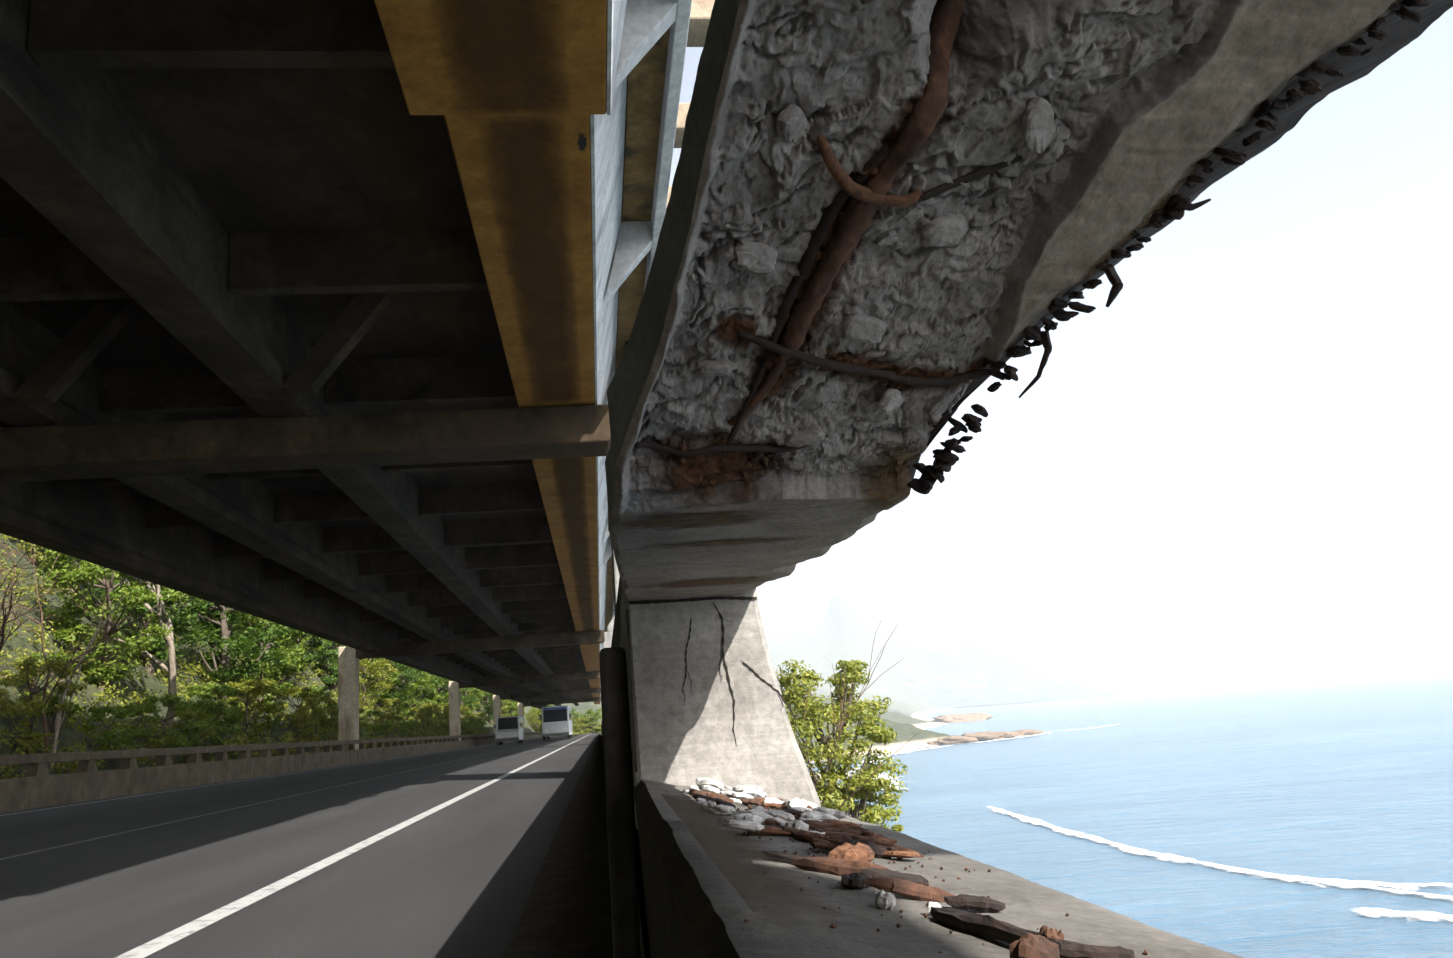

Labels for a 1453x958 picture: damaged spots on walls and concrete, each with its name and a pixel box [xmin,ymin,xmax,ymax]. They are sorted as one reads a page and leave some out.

rust [715,86,994,397]
spalling [619,0,1430,515]
rust [654,432,782,508]
crack [629,596,799,746]